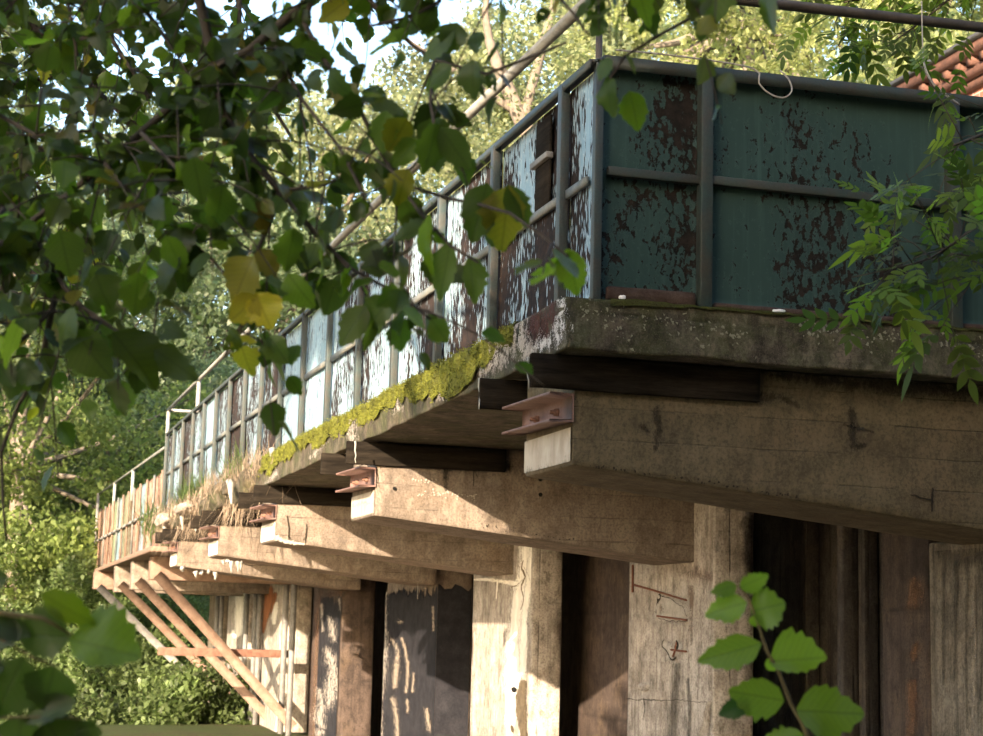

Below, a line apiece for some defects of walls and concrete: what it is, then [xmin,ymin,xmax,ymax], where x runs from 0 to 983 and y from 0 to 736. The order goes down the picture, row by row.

rust [262,586,277,634]
peeling [309,602,339,736]
peeling [381,593,415,736]